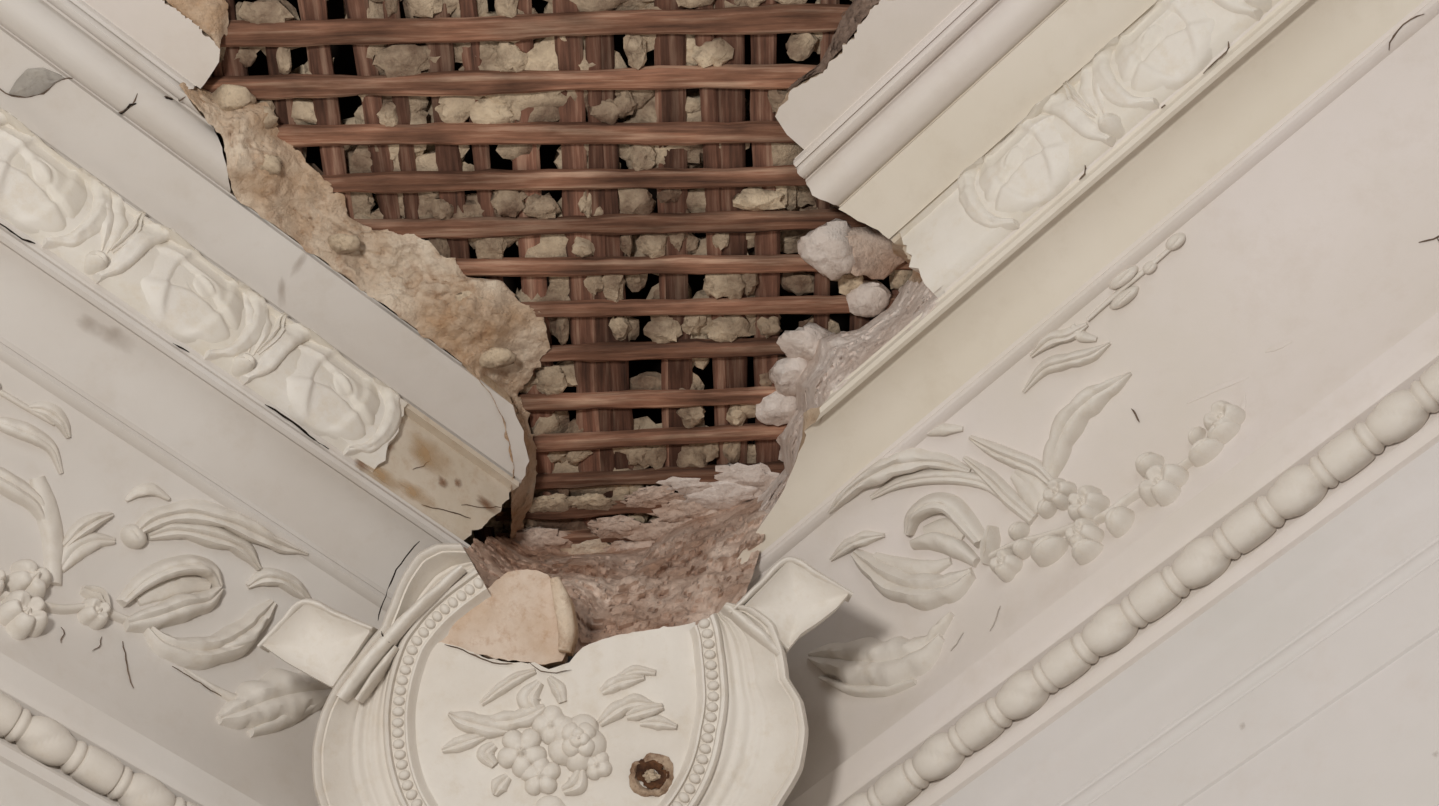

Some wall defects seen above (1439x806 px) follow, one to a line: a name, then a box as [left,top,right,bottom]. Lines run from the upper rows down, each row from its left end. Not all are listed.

flaking render [166,0,229,49]
flaking render [787,0,879,92]
flaking render [179,82,939,669]
corrosion [629,753,674,797]